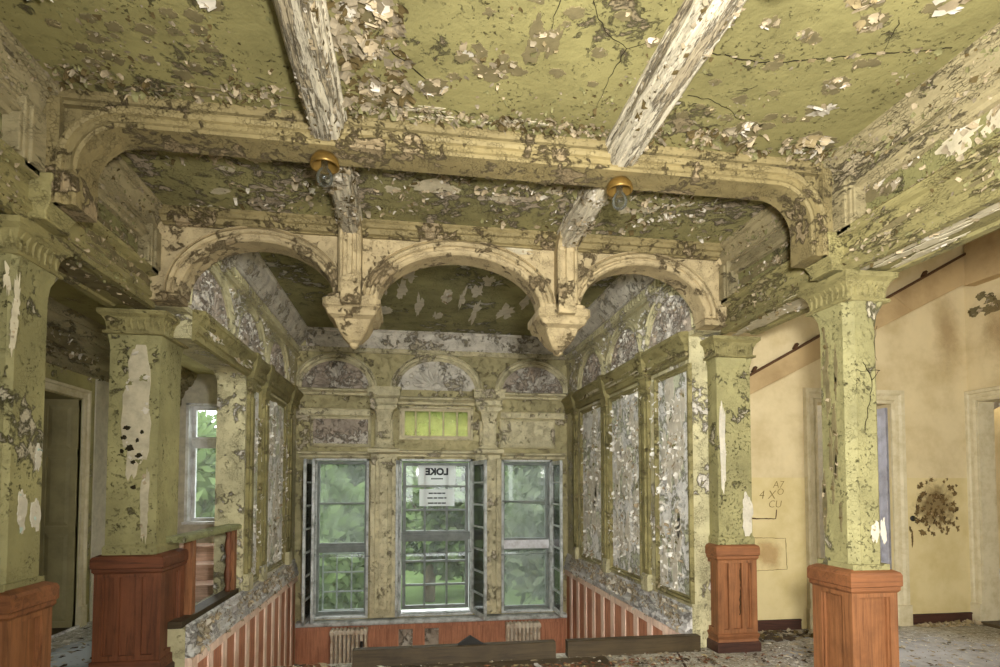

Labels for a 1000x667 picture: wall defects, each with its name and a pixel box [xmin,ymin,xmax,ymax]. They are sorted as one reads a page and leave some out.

peeling [332,0,397,68]
crack [387,46,429,85]
crack [593,0,664,117]
peeling [368,169,461,200]
peeling [865,104,1000,203]
peeling [859,202,1000,270]
peeling [3,261,21,357]
peeling [121,345,151,543]
peeling [17,490,41,534]
peeling [743,491,753,536]
peeling [871,518,887,544]
water stain [919,491,951,523]